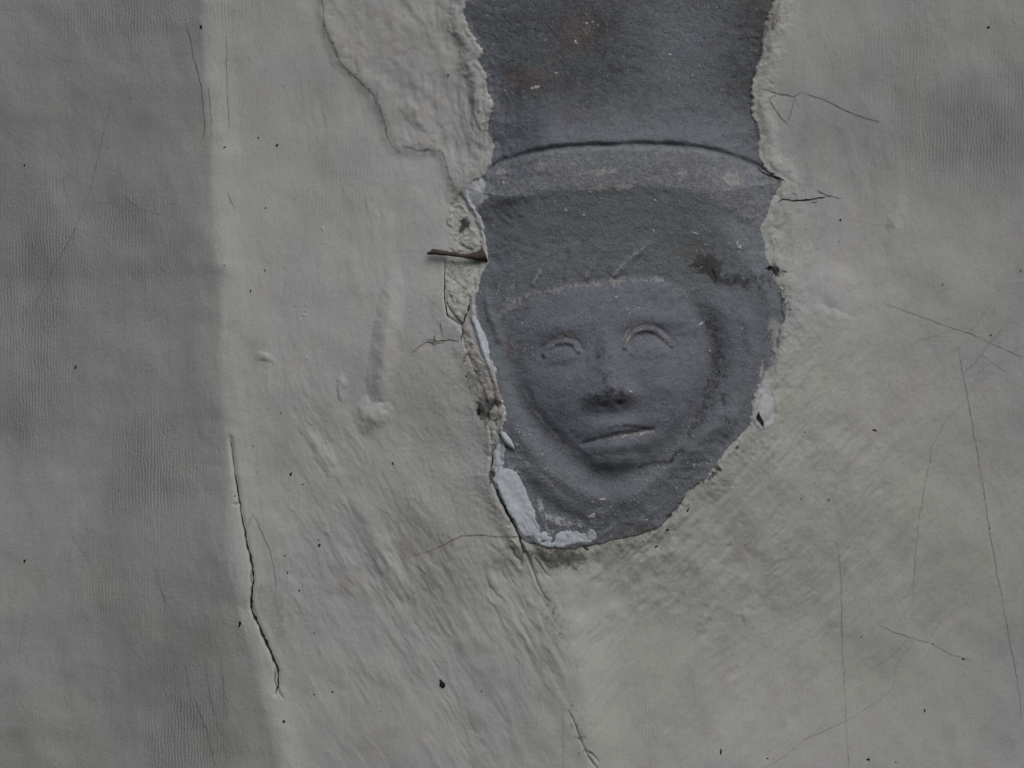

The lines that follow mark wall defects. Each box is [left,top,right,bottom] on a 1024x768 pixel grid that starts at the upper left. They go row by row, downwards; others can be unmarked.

crack [762,88,879,124]
crack [758,168,843,203]
peeling [445,0,596,548]
peeling [752,314,788,430]
crack [230,439,283,698]